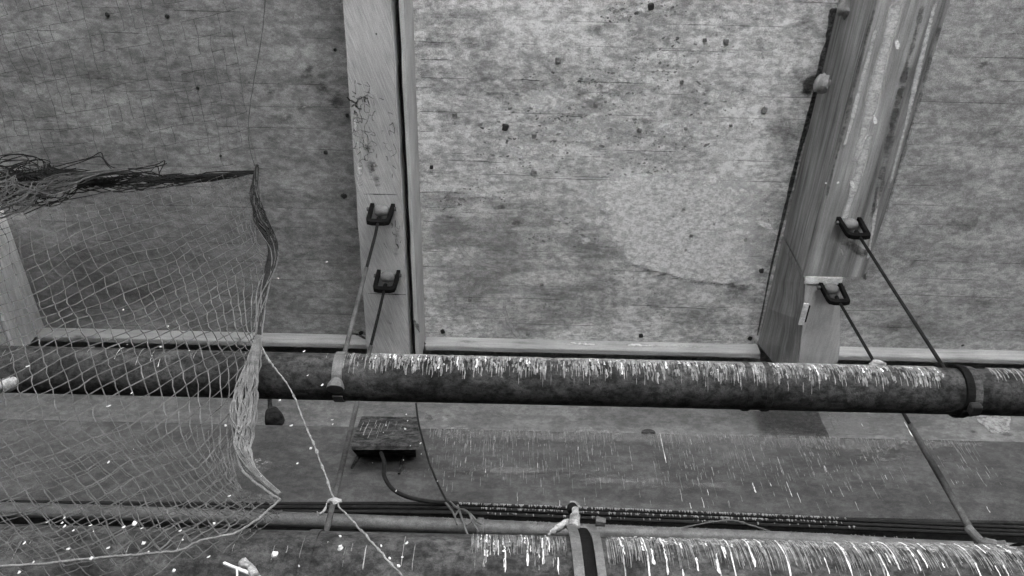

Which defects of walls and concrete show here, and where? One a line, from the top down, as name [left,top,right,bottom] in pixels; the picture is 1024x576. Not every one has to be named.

water stain [343,352,944,394]
water stain [987,368,1024,383]
water stain [424,415,651,504]
water stain [648,411,907,516]
water stain [471,533,567,574]
water stain [606,536,1024,576]